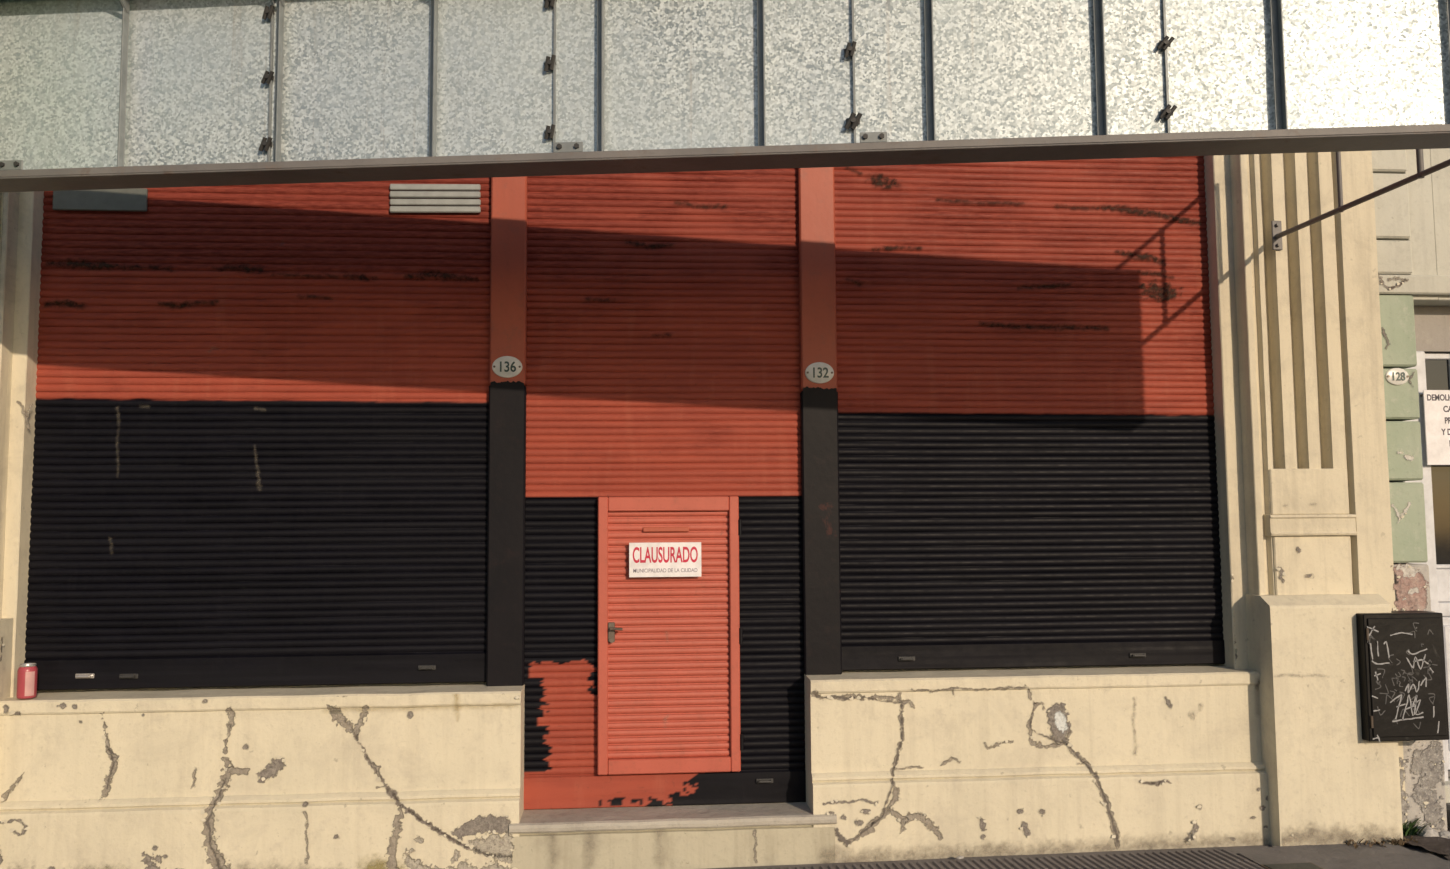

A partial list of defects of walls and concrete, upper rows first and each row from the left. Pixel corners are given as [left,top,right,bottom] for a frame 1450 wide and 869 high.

peeling [0,819,30,836]
crack [97,712,119,803]
crack [192,707,250,869]
spalling [257,755,286,783]
crack [327,705,512,869]
spalling [403,814,518,869]
crack [812,685,1120,849]
crack [1134,729,1170,786]